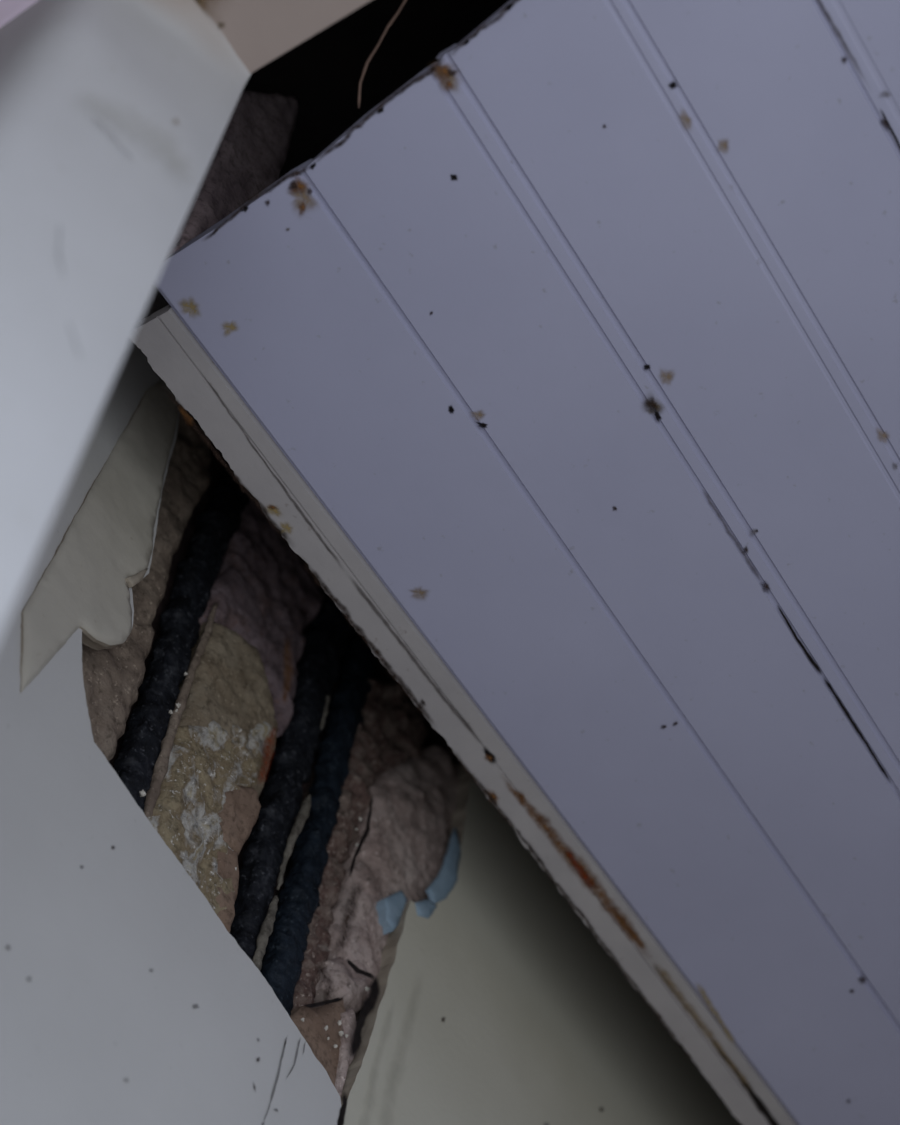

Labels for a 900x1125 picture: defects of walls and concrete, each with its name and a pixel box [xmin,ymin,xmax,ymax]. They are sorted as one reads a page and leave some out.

peeling [20,379,211,761]
spalling [139,494,325,933]
spalling [252,767,315,971]
spalling [290,678,461,1097]
rust [511,789,643,947]
rust [662,972,746,1082]